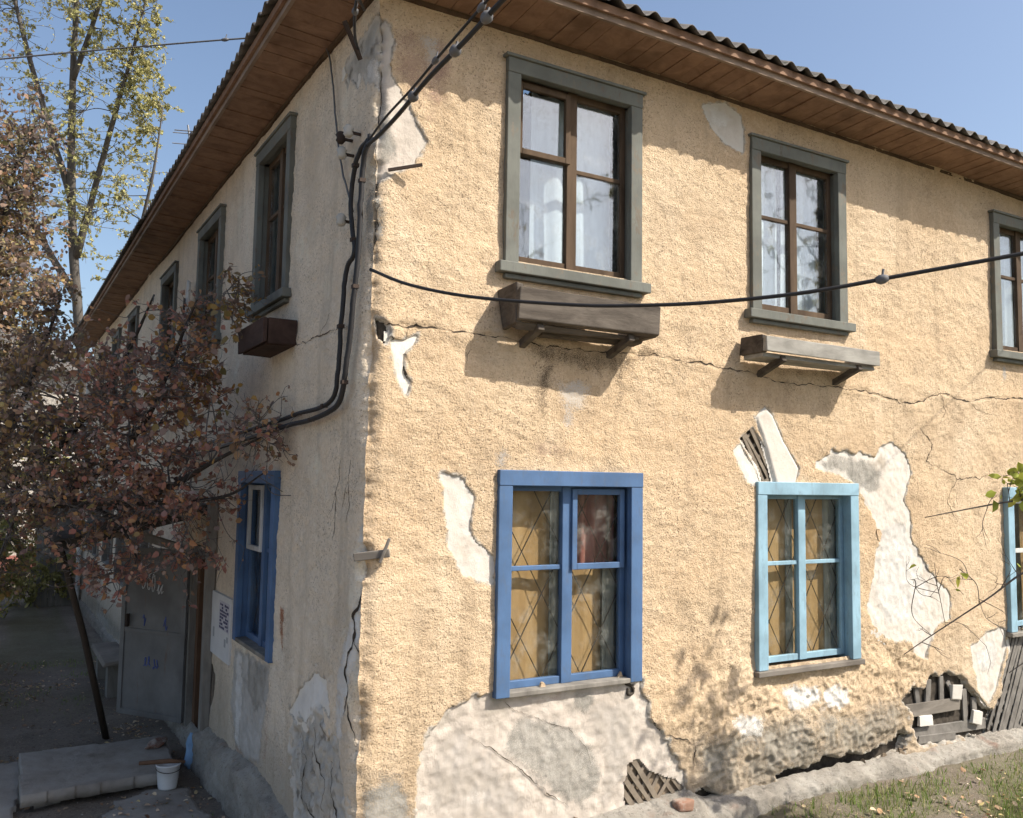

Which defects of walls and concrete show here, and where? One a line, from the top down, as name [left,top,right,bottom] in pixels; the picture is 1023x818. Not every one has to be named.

peeling [342,16,427,183]
peeling [702,103,743,152]
spalling [376,320,417,394]
peeling [441,472,494,583]
crack [387,323,1023,518]
peeling [733,440,761,483]
peeling [816,443,951,657]
spalling [287,664,352,818]
crack [343,585,363,736]
spalling [416,671,686,818]
peeling [971,628,1010,707]